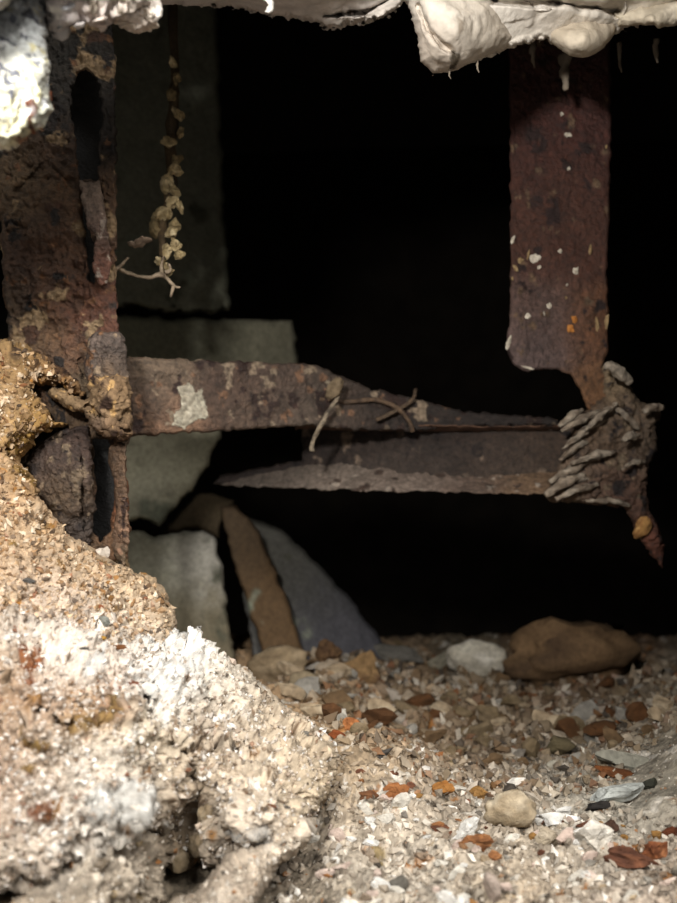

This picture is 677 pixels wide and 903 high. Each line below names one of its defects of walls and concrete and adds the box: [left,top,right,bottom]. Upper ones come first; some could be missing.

spalling [45,0,163,41]
flaking render [263,0,275,14]
crack [524,0,598,8]
corrosion [14,98,37,144]
corrosion [79,180,112,286]
corrosion [11,342,78,389]
corrosion [5,432,37,455]
corrosion [108,439,130,567]